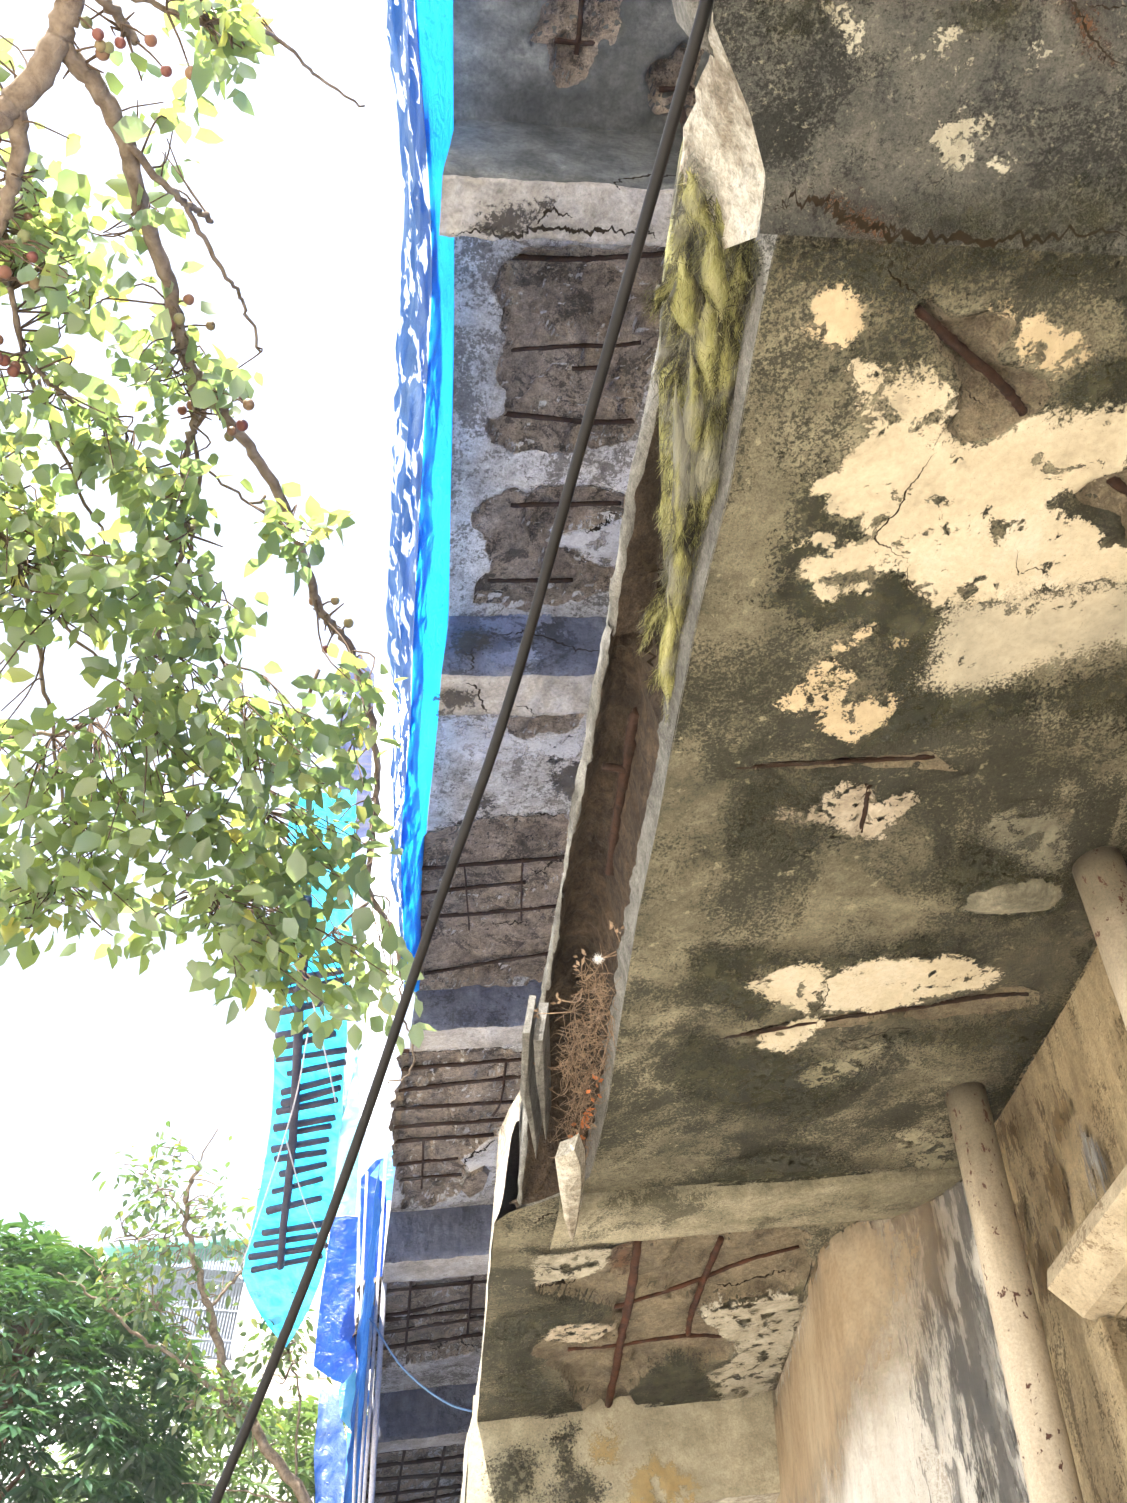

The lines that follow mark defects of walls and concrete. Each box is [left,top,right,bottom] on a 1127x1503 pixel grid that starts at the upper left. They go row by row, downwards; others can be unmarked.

crack [452,206,656,240]
crack [613,174,676,190]
crack [771,188,1127,297]
spalling [388,0,779,1210]
peeling [736,280,1127,841]
peeling [714,953,1040,1088]
leakage [661,826,1108,1363]
spalling [352,1274,488,1370]
mould [477,1287,618,1503]
corrosion [607,1241,643,1275]
spalling [529,1227,815,1503]
leakage [773,1180,1030,1503]